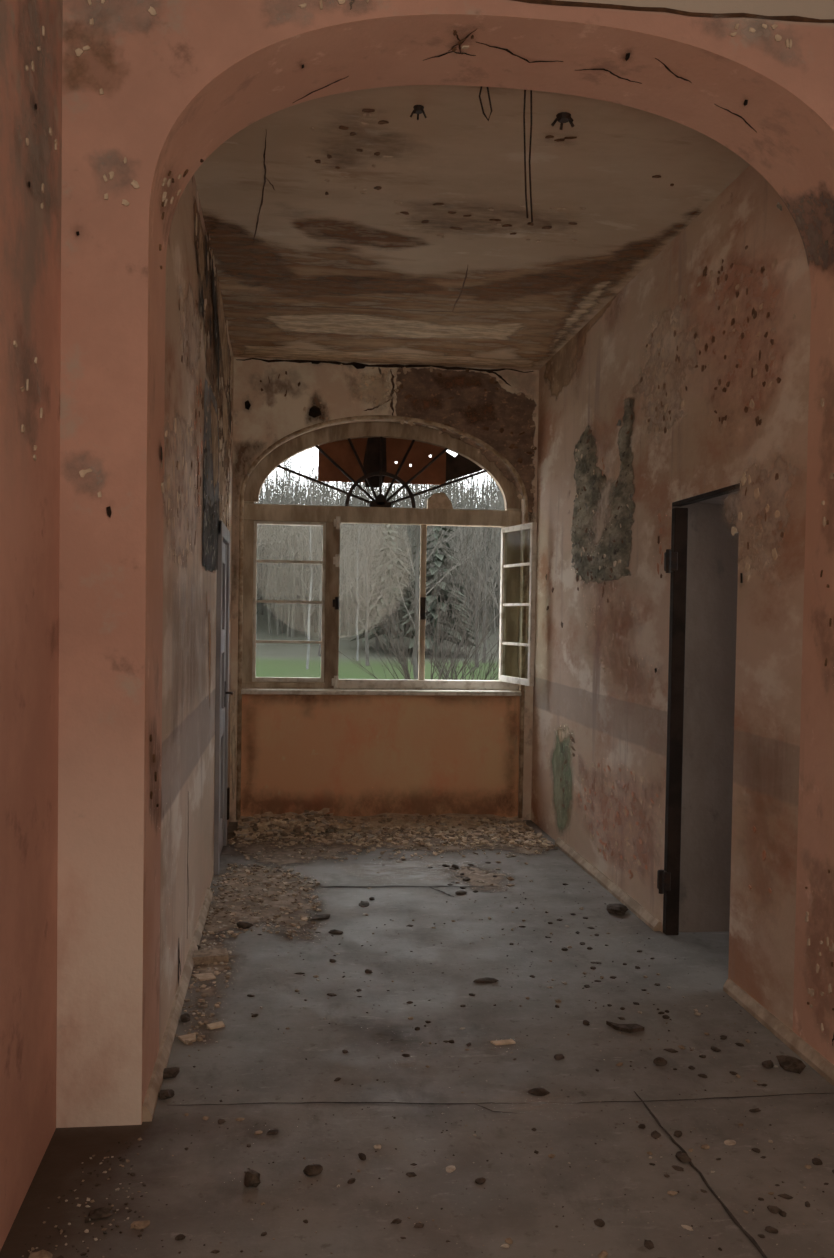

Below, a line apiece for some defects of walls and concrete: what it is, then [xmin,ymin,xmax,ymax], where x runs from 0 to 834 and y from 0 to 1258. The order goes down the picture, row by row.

crack [293,76,348,103]
crack [423,42,690,84]
crack [513,0,834,23]
crack [715,104,754,130]
leakage [204,210,701,399]
flaking render [194,199,251,572]
flaking render [303,394,329,421]
flaking render [393,366,537,513]
flaking render [571,398,635,630]
crack [199,1091,829,1258]